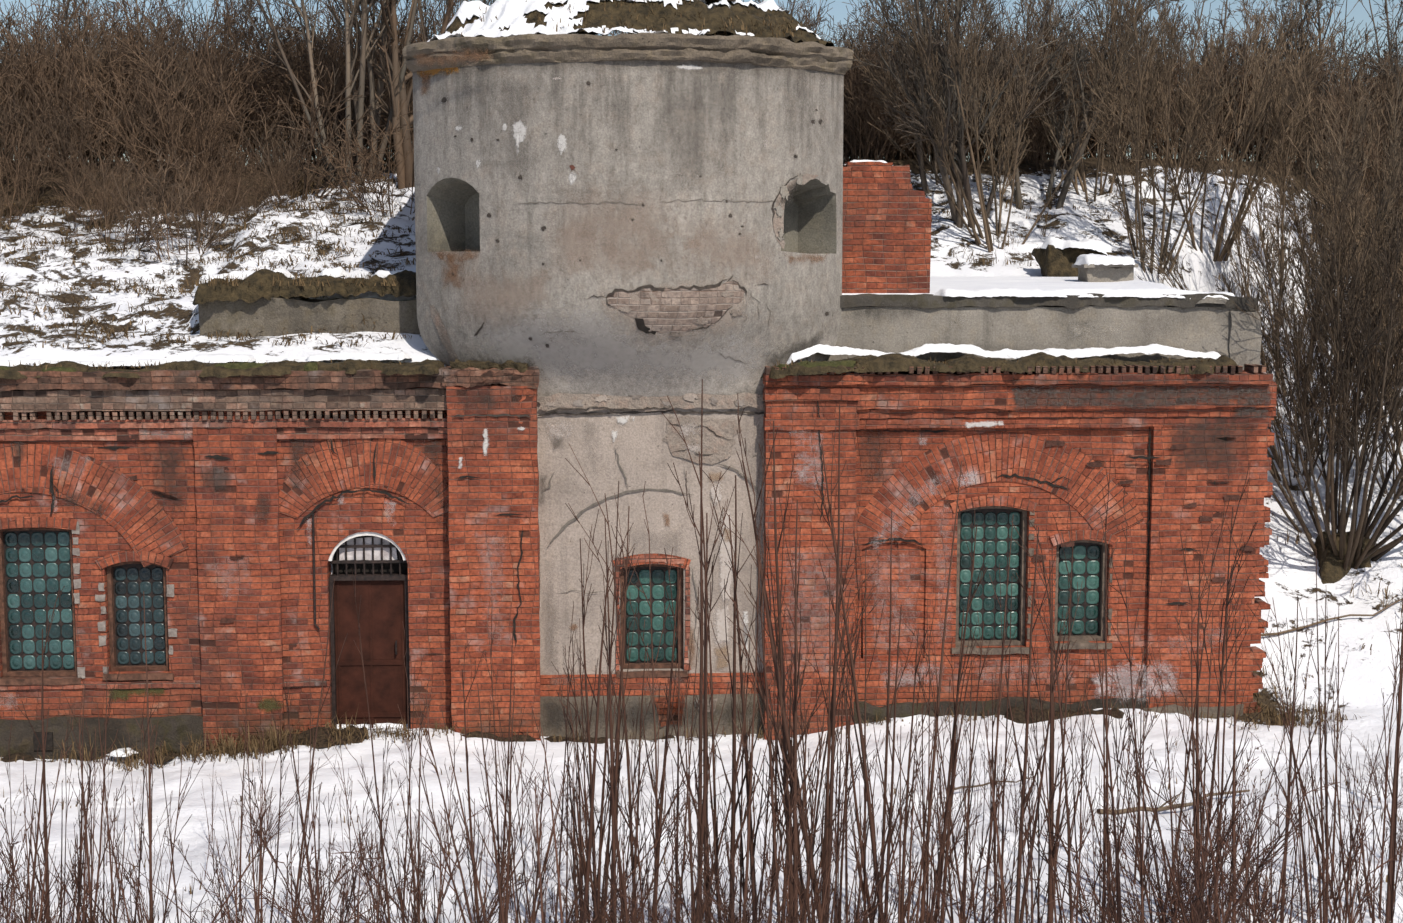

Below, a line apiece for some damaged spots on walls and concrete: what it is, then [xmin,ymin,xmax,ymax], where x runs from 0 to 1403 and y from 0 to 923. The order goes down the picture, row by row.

spalling [588,275,768,341]
crack [450,410,764,418]
crack [998,473,1072,490]
crack [513,449,764,656]
water stain [1095,666,1169,697]